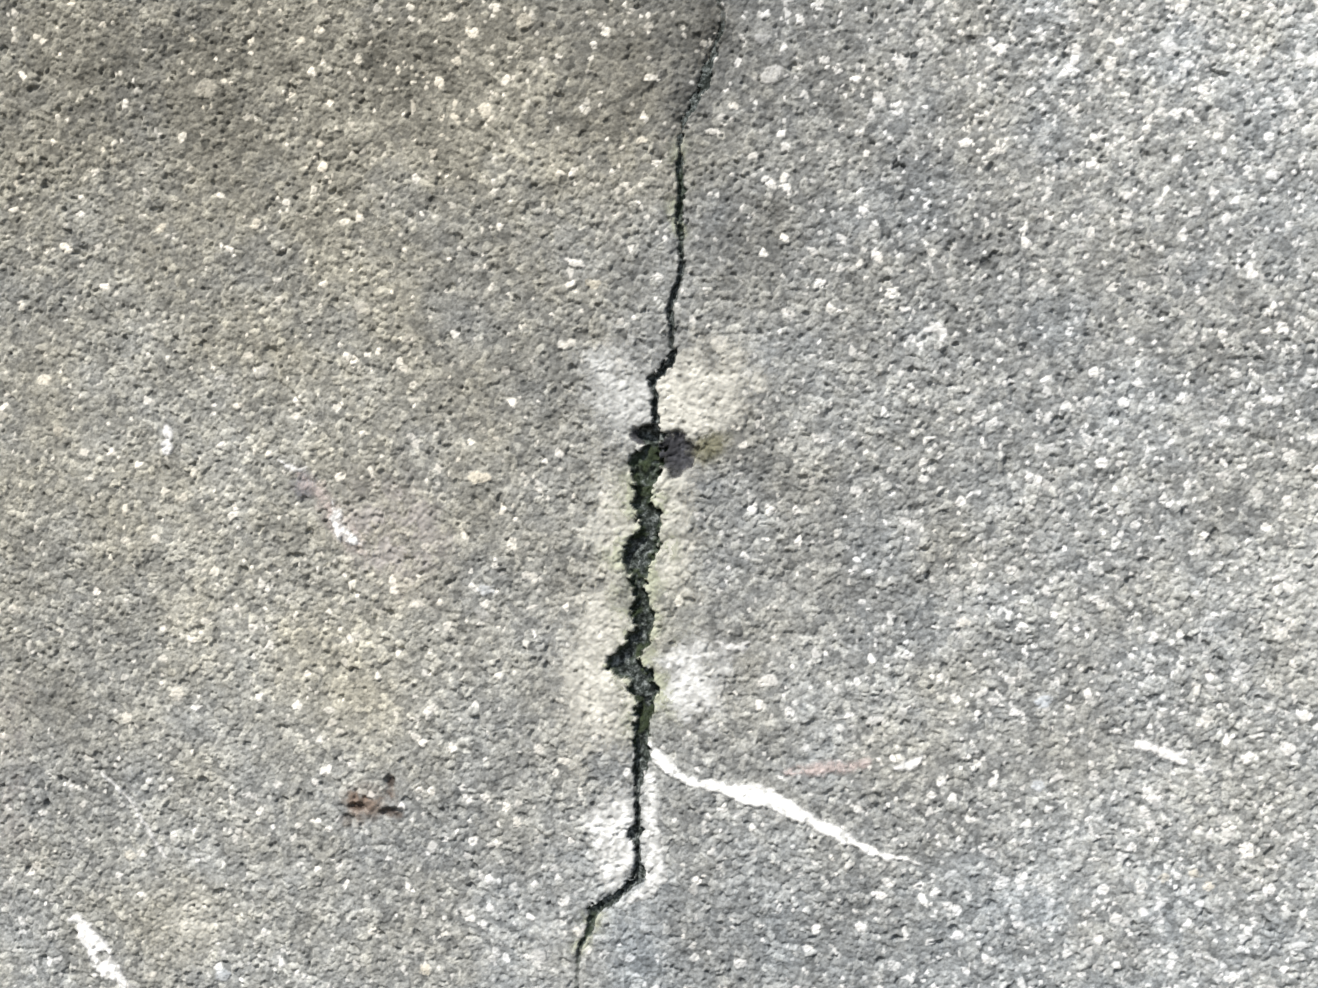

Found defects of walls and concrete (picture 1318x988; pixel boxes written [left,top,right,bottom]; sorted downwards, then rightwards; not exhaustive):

crack [577,0,726,964]